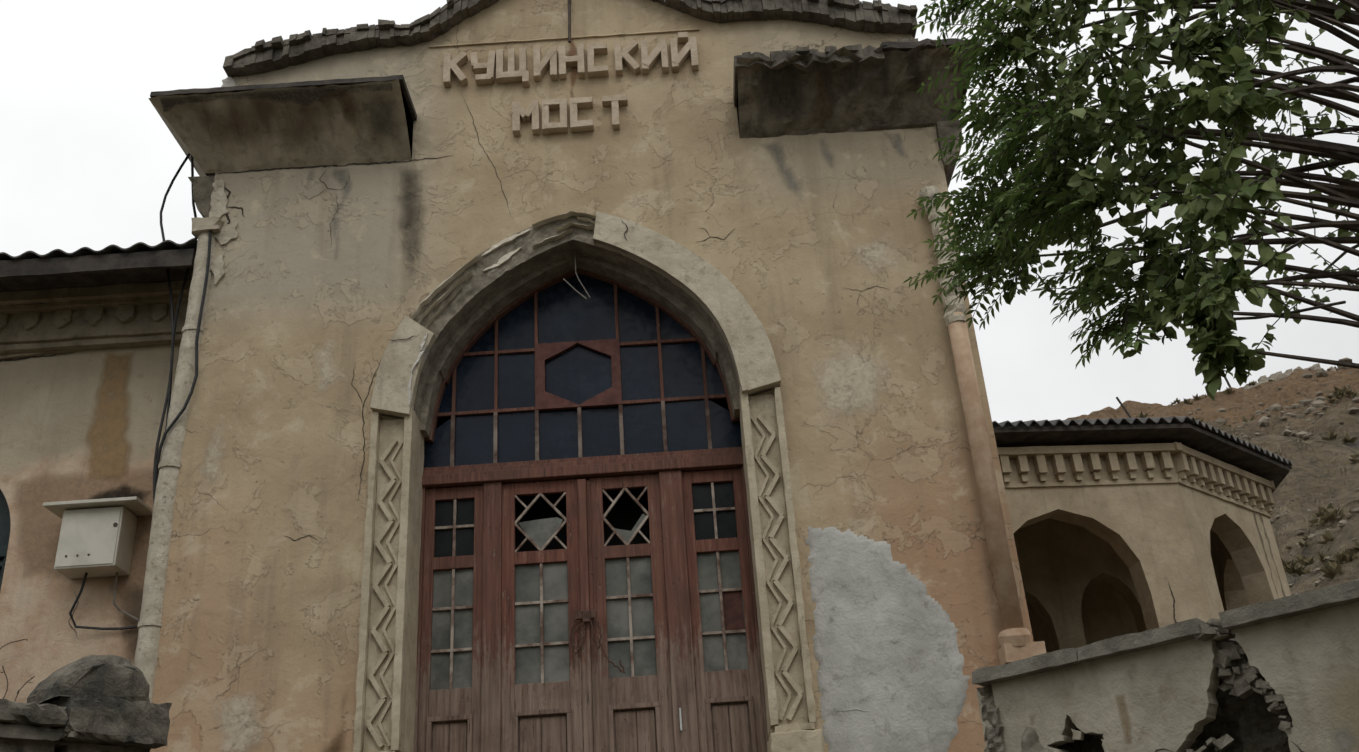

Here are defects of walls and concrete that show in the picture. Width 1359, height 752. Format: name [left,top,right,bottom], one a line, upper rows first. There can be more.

spalling [977,687,1004,752]
spalling [1071,729,1084,740]
spalling [1186,734,1234,752]
spalling [1213,640,1293,734]